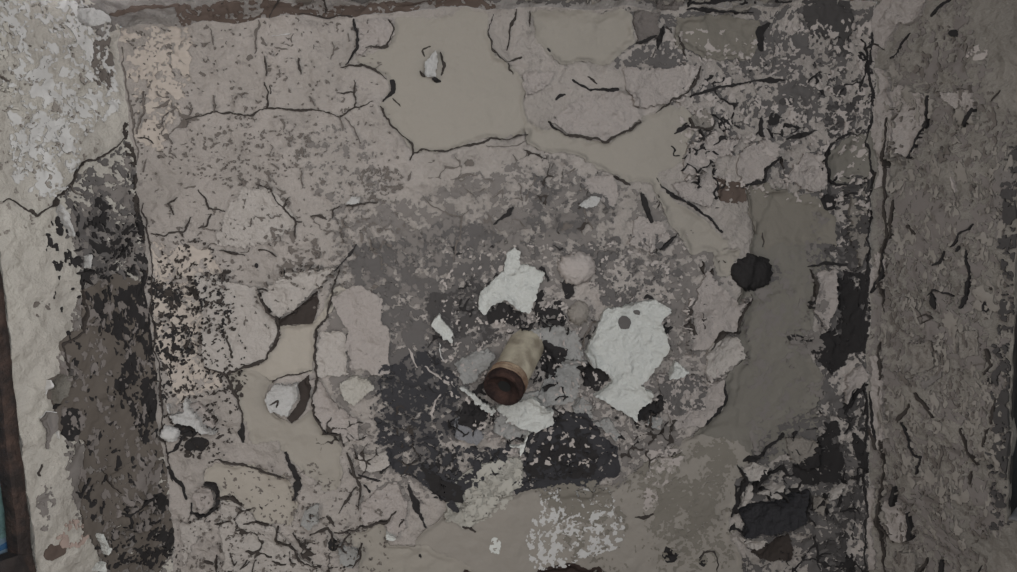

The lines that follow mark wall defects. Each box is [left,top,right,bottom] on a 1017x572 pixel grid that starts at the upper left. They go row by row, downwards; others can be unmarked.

spalling [657,0,760,61]
crack [548,0,911,233]
crack [3,0,728,572]
peeling [431,313,453,343]
rust [484,367,525,406]
peeling [478,247,545,315]
leakage [434,233,738,572]
leakage [667,0,1017,572]
crack [699,341,996,572]
peeling [866,463,926,572]
crack [819,95,993,375]
peeling [843,251,973,524]